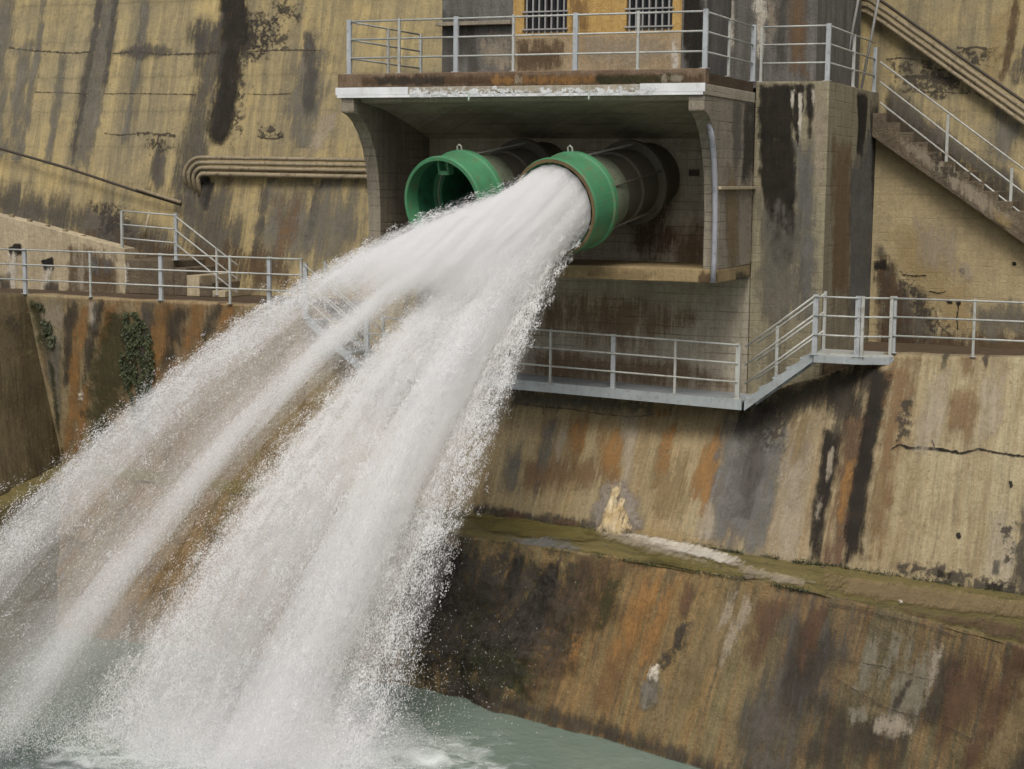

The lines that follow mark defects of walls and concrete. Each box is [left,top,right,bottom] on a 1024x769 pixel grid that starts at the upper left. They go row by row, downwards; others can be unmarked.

leakage [40,0,366,451]
leakage [727,83,827,324]
leakage [603,366,892,584]
crack [891,441,1024,457]